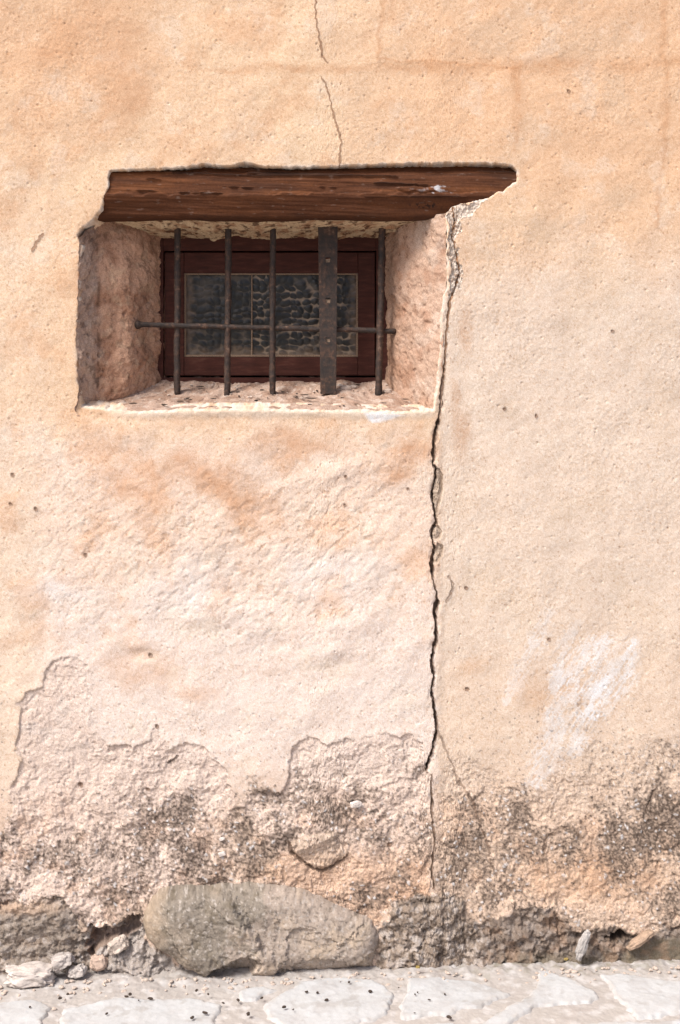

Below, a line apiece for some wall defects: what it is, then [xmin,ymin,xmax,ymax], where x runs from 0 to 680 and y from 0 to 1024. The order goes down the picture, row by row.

crack [314,0,342,169]
spalling [445,198,488,298]
crack [425,207,497,889]
peeling [0,655,680,977]